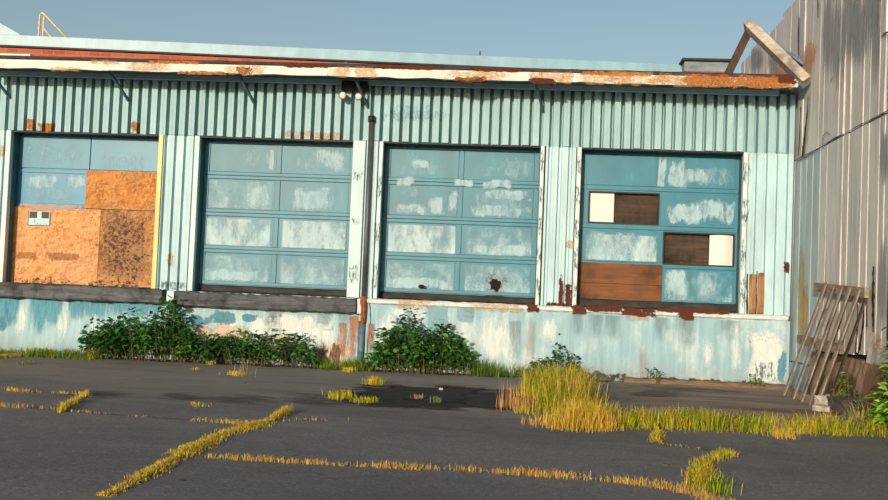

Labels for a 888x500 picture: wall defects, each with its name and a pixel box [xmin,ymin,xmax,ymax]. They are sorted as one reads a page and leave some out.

damp [821,0,880,89]
rust [149,60,252,75]
rust [452,67,557,85]
rust [678,64,798,90]
peeling [206,218,270,246]
peeling [282,221,345,249]
peeling [374,179,544,254]
rust [527,275,572,312]
peeling [182,310,258,348]
peeling [746,329,786,383]
damp [332,384,537,410]
crack [105,452,192,495]